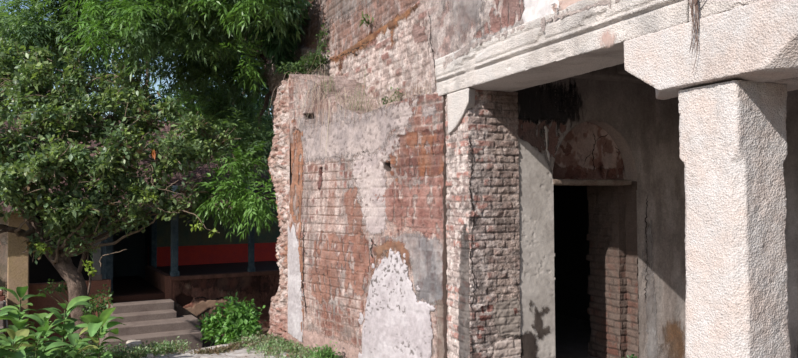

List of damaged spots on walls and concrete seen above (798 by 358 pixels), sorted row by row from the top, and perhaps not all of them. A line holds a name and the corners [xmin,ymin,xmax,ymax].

spalling [443,0,620,69]
flaking render [287,97,444,358]
crack [468,136,478,310]
spalling [476,305,493,339]
flaking render [487,118,624,358]